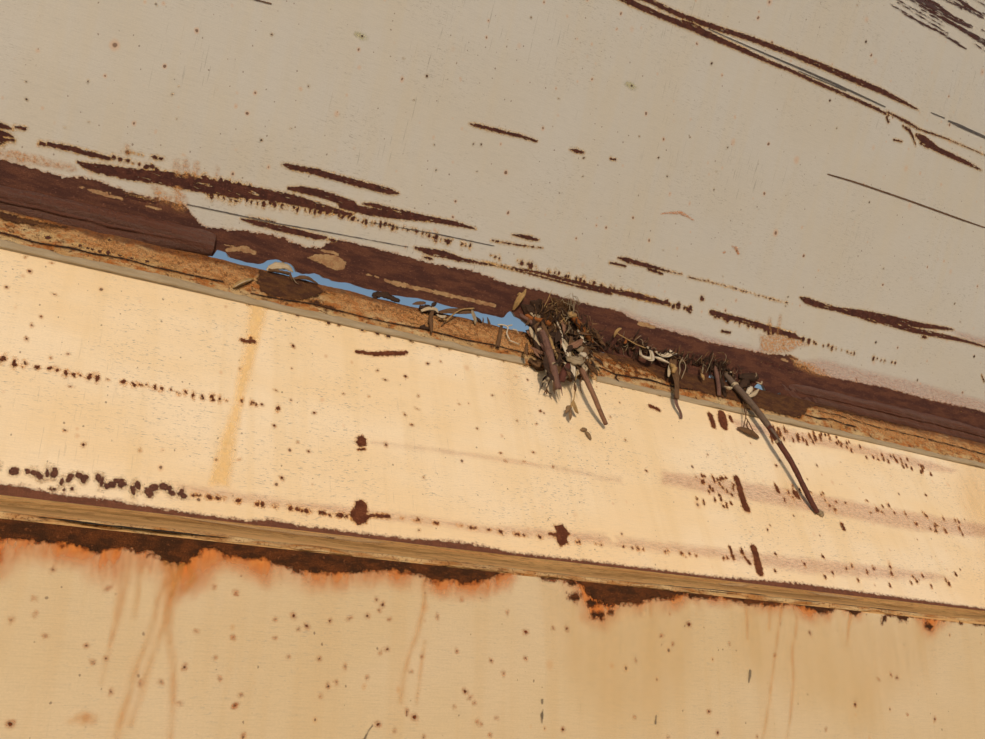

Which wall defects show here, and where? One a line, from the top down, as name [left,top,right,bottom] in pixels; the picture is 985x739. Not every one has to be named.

spalling [39,141,165,172]
peeling [915,133,981,170]
peeling [241,217,347,270]
peeling [323,210,513,270]
peeling [492,234,541,248]
peeling [366,274,496,307]
corrosion [0,153,985,457]
peeling [610,257,789,307]
peeling [707,410,734,430]
corrosion [0,484,985,611]
corrosion [541,577,835,621]
corrosion [881,614,985,631]